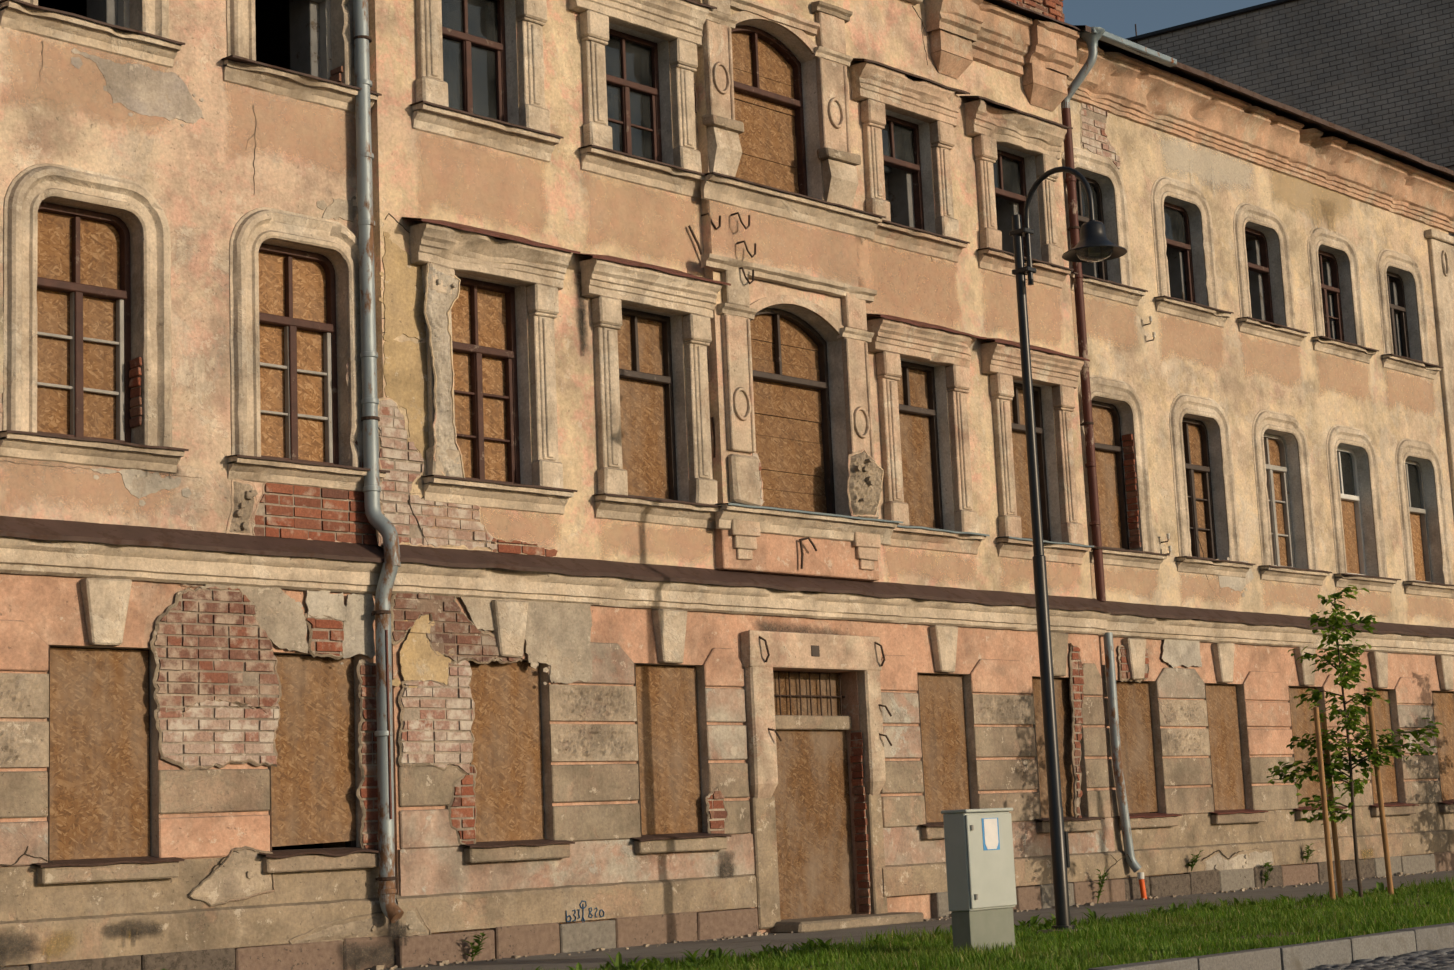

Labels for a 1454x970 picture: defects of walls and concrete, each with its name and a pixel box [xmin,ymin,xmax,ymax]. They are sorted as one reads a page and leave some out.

flaking render [226,232,559,557]
flaking render [1122,433,1141,549]
spalling [189,846,275,907]
flaking render [150,584,593,849]
flaking render [704,786,728,834]
flaking render [850,730,871,912]
flaking render [1068,643,1084,818]